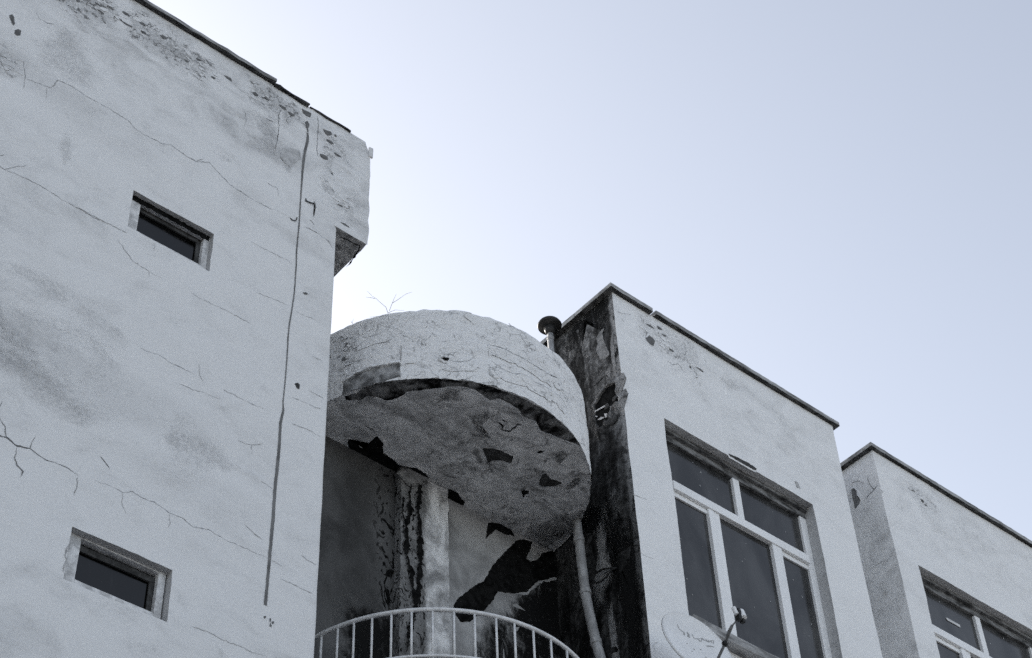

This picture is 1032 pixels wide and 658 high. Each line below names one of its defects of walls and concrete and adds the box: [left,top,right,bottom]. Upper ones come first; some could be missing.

flaking render [6,12,24,39]
peeling [59,0,344,175]
crack [0,53,326,606]
flaking render [336,333,580,447]
damp [568,295,610,347]
spalling [590,327,628,440]
flaking render [345,433,467,551]
flaking render [482,446,514,465]
flaking render [520,472,564,498]
flaking render [449,520,557,627]
damp [584,507,647,658]